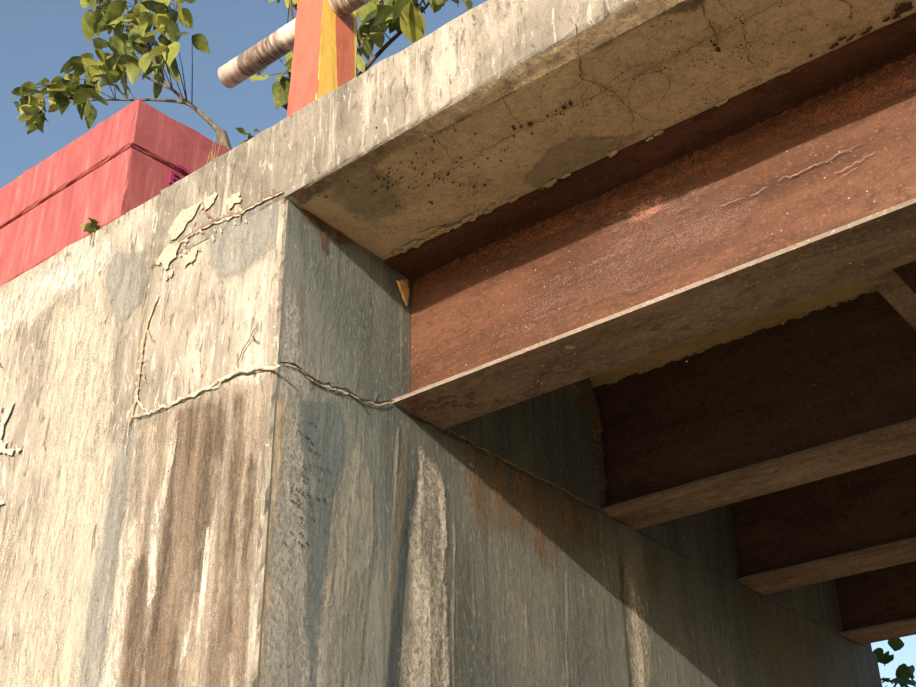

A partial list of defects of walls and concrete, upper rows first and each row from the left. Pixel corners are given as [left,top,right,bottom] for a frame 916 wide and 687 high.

crack [376,0,782,233]
spalling [156,192,247,280]
crack [174,189,283,246]
corrosion [416,52,916,290]
peeling [0,238,113,334]
crack [128,296,394,440]
peeling [0,401,21,455]
leakage [9,252,376,687]
crack [448,430,601,511]